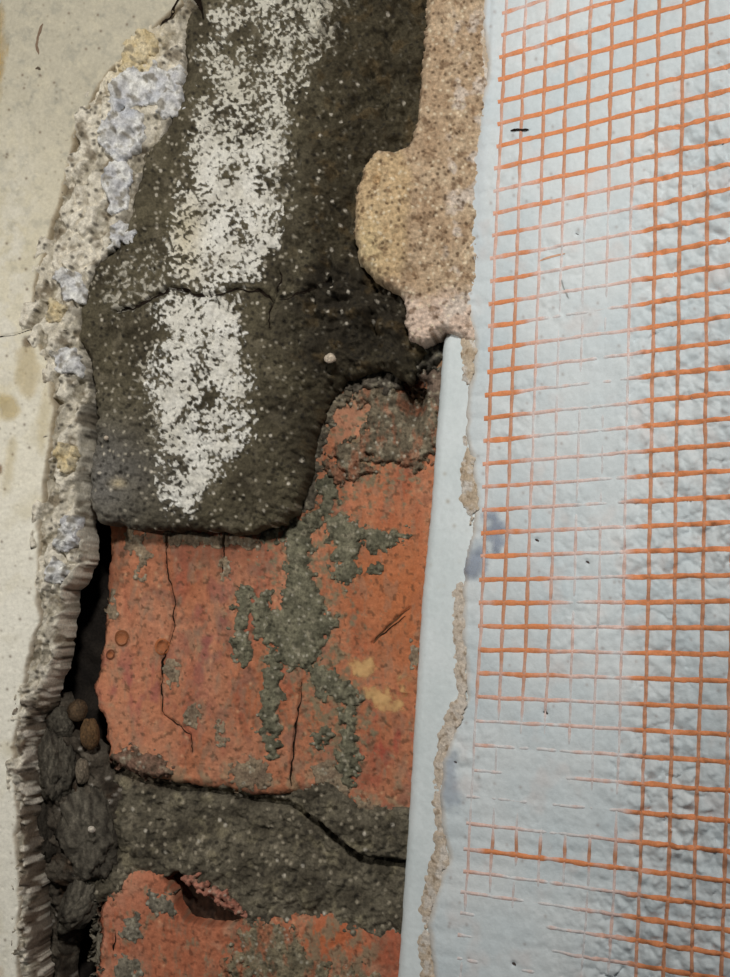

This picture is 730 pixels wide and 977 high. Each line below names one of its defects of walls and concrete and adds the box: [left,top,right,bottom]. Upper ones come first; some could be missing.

efflorescence [97,0,349,519]
flaking render [460,338,478,385]
spalling [5,0,199,977]
flaking render [458,435,479,525]
crack [161,541,193,752]
flaking render [417,581,467,977]
spalling [173,872,247,921]